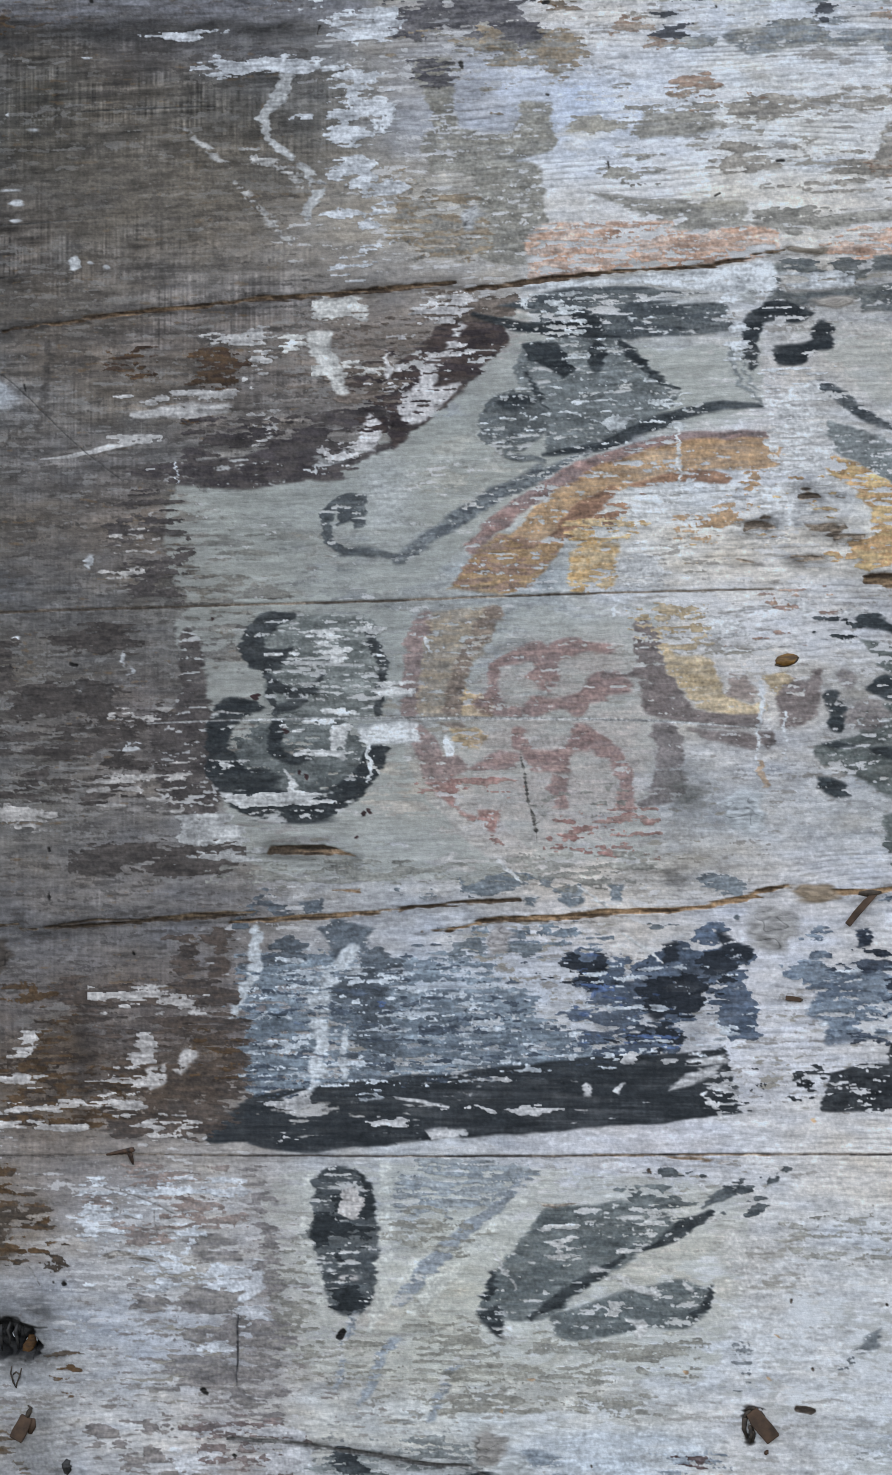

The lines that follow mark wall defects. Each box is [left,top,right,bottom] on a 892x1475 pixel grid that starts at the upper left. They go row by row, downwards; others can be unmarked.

peeling [0,0,892,1153]
rust [0,1163,70,1280]
rust [56,1351,85,1399]